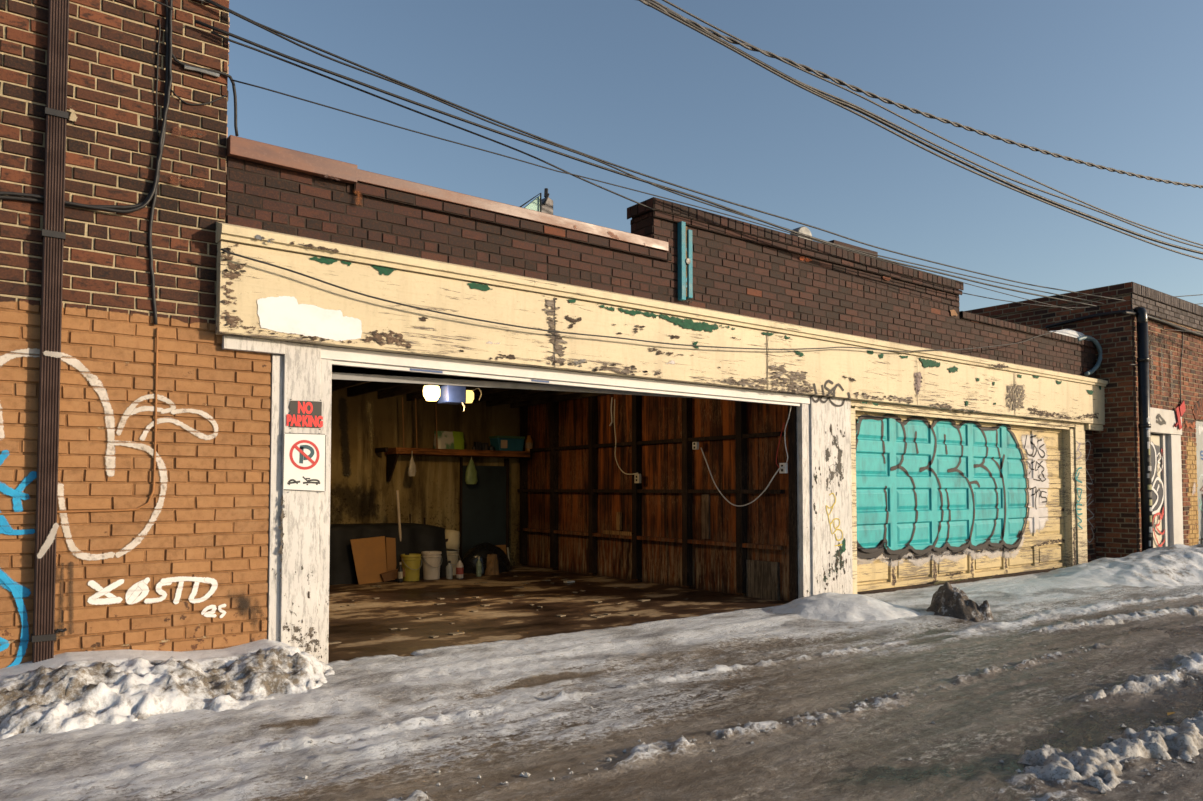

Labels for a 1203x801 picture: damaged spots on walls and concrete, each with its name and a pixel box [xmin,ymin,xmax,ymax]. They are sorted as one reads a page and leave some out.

peeling [219,243,412,348]
peeling [542,295,741,378]
peeling [701,332,814,394]
peeling [843,350,958,406]
peeling [930,364,1099,420]
peeling [812,424,845,530]
peeling [823,538,847,590]
peeling [278,619,325,659]